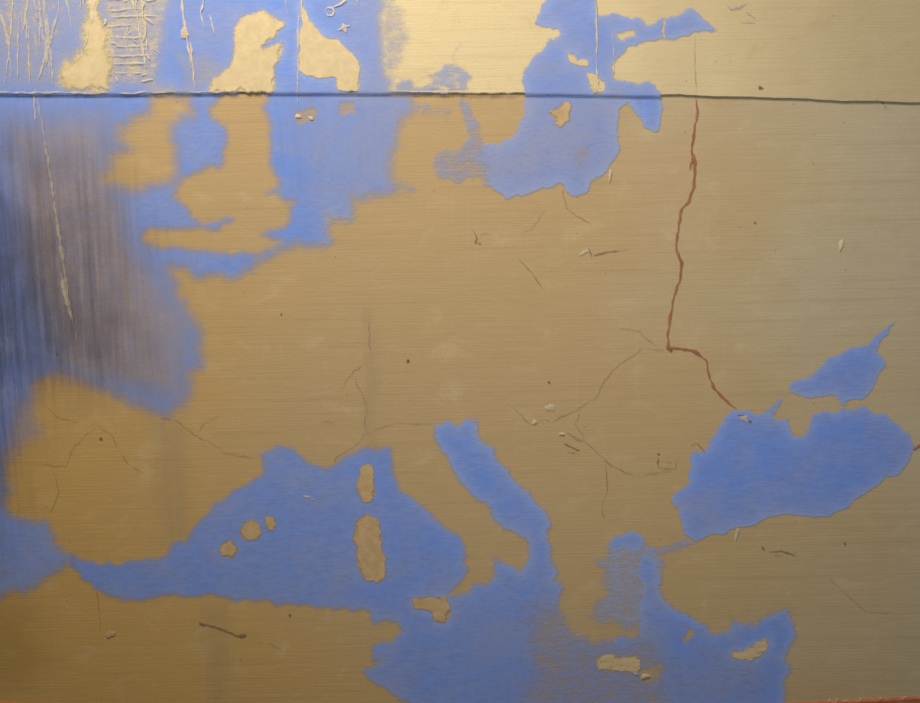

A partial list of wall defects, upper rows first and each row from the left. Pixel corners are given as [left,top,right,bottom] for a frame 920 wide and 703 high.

leakage [33,91,77,339]
peeling [0,0,501,600]
peeling [434,0,714,199]
crack [666,100,735,408]